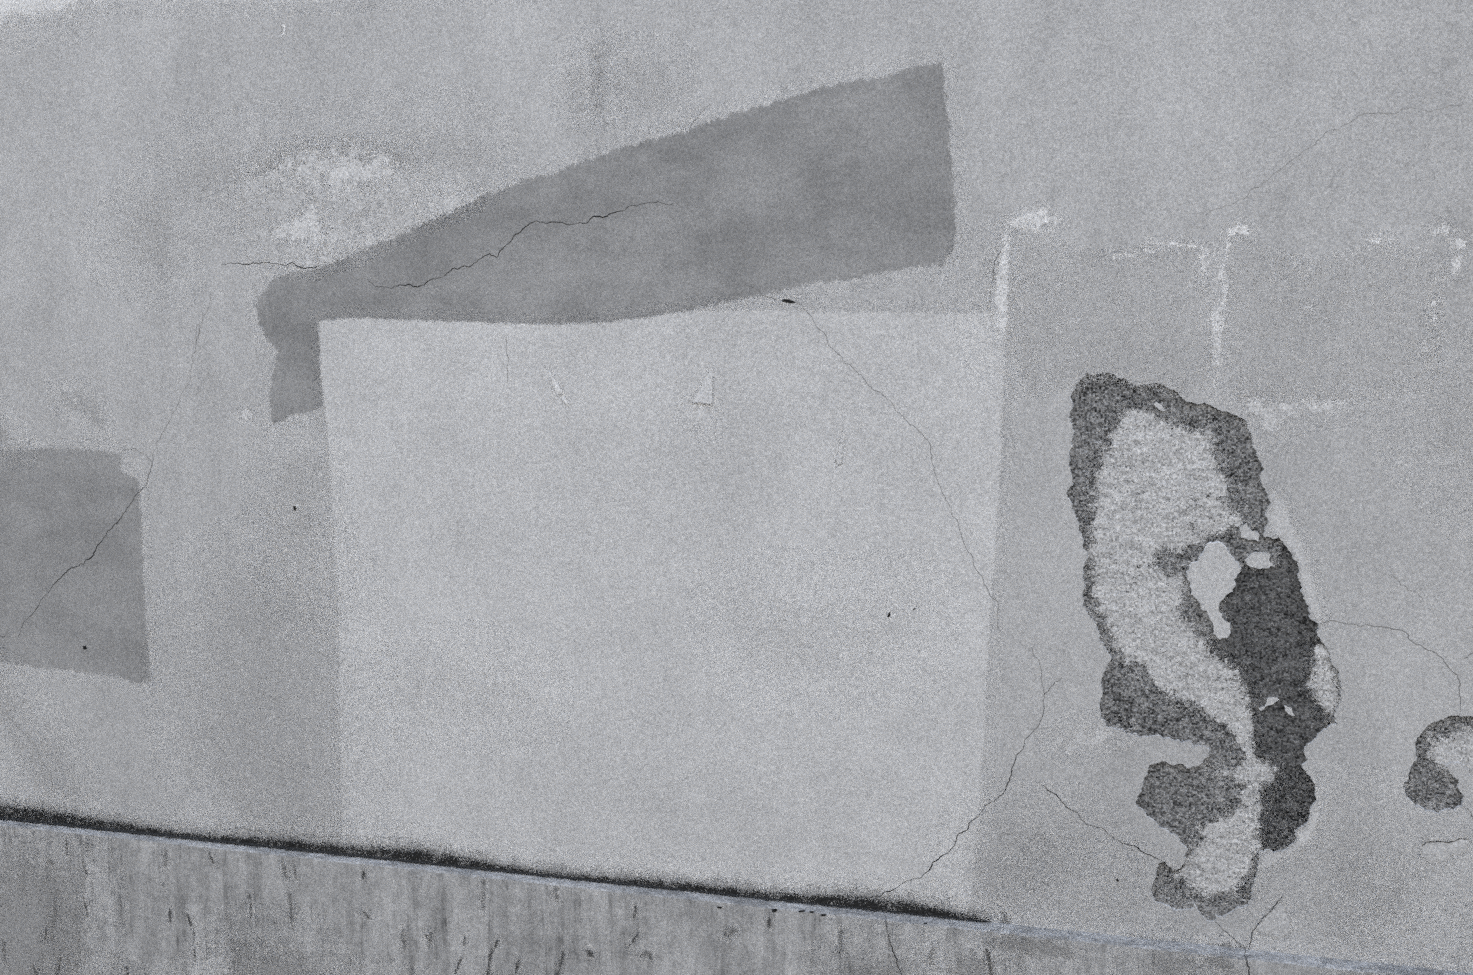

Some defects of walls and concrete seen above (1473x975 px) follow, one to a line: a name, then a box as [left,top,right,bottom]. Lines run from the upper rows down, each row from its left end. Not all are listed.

crack [368,201,673,289]
crack [4,262,321,637]
crack [737,273,1001,631]
flaking render [1051,223,1349,922]
crack [870,649,1164,975]
flaking render [1403,715,1473,814]